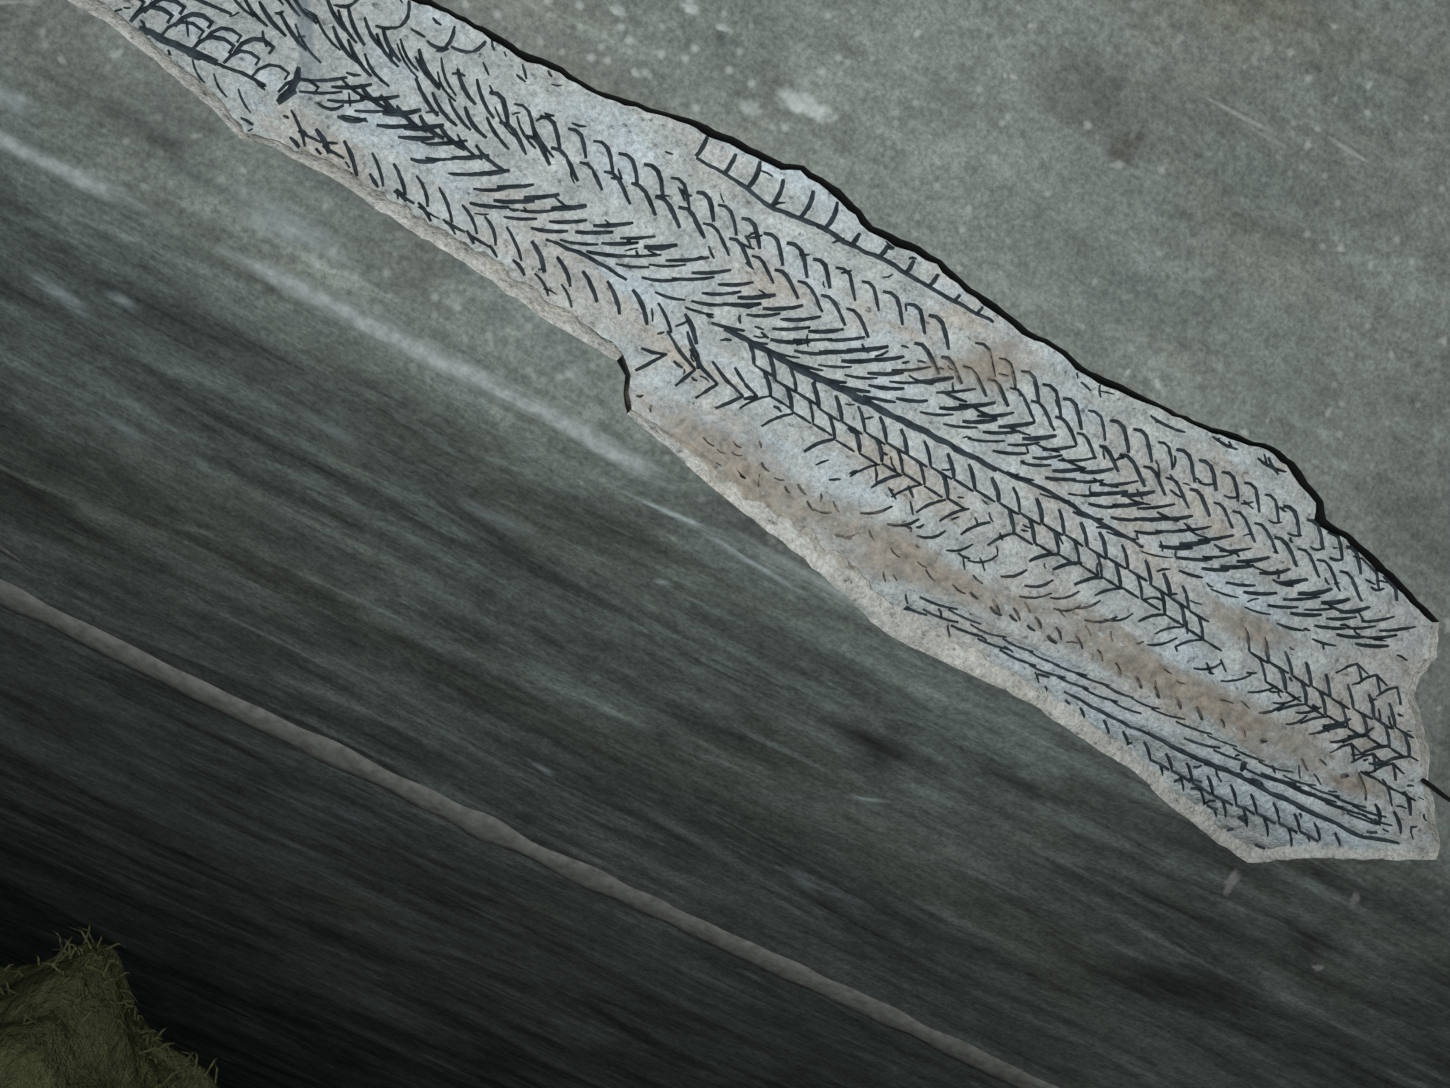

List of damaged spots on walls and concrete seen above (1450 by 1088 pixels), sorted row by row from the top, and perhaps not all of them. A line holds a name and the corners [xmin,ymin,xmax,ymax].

flaking render [68,0,1440,863]
crack [1420,778,1450,802]